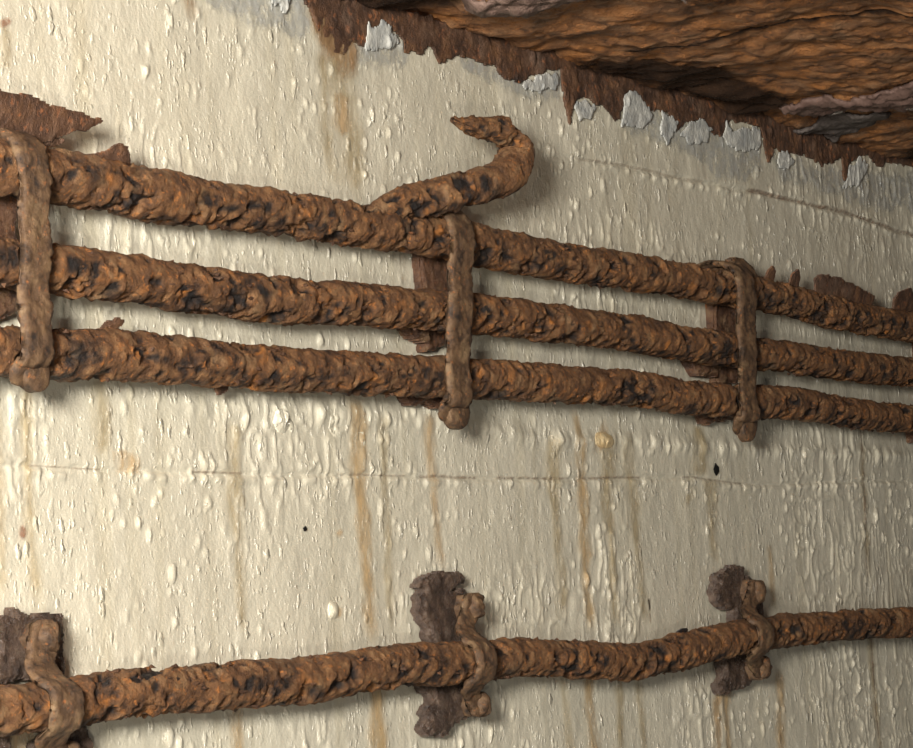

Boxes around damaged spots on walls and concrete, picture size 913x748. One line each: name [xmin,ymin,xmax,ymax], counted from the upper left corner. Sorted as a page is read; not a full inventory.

rust [314,18,357,73]
crack [627,9,913,53]
rust [0,89,103,143]
peeling [211,0,913,213]
rust [94,143,131,164]
rust [764,266,776,281]
rust [788,269,801,287]
rust [813,274,875,305]
rust [892,288,913,312]
rust [99,317,125,329]
rust [352,406,372,623]
rust [579,475,593,618]